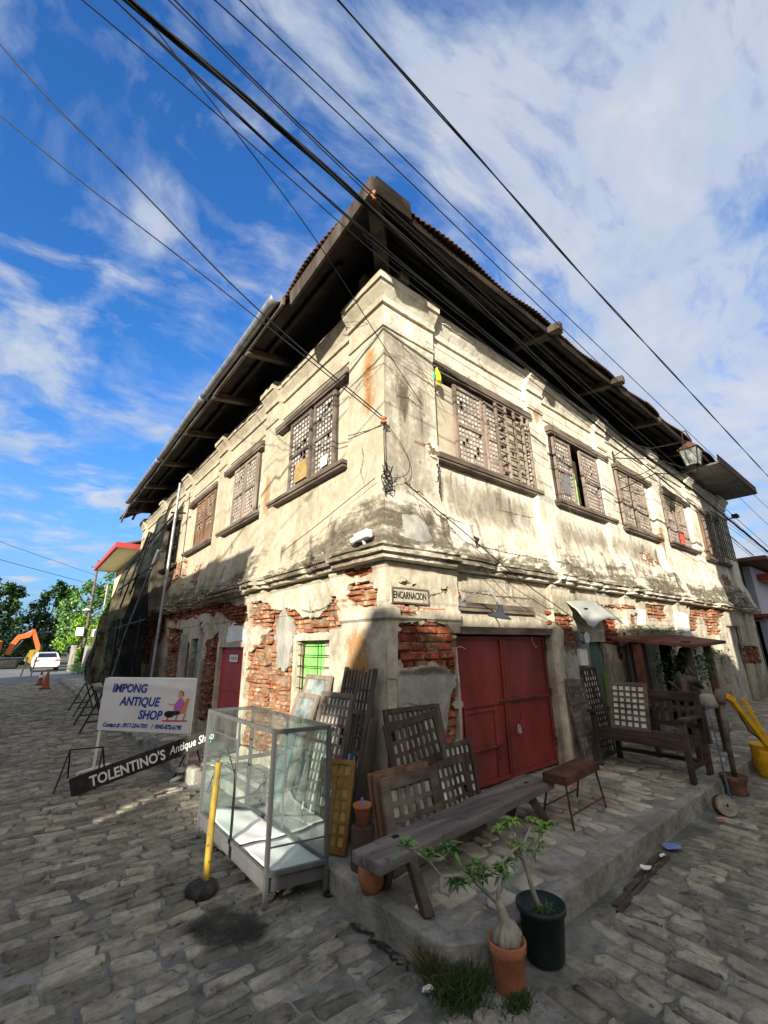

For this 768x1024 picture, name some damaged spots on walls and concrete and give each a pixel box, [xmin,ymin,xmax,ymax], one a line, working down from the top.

rust [363,350,374,410]
damp [159,498,756,612]
flaking render [141,559,380,753]
flaking render [396,603,464,749]
flaking render [599,603,667,660]
flaking render [689,606,724,638]